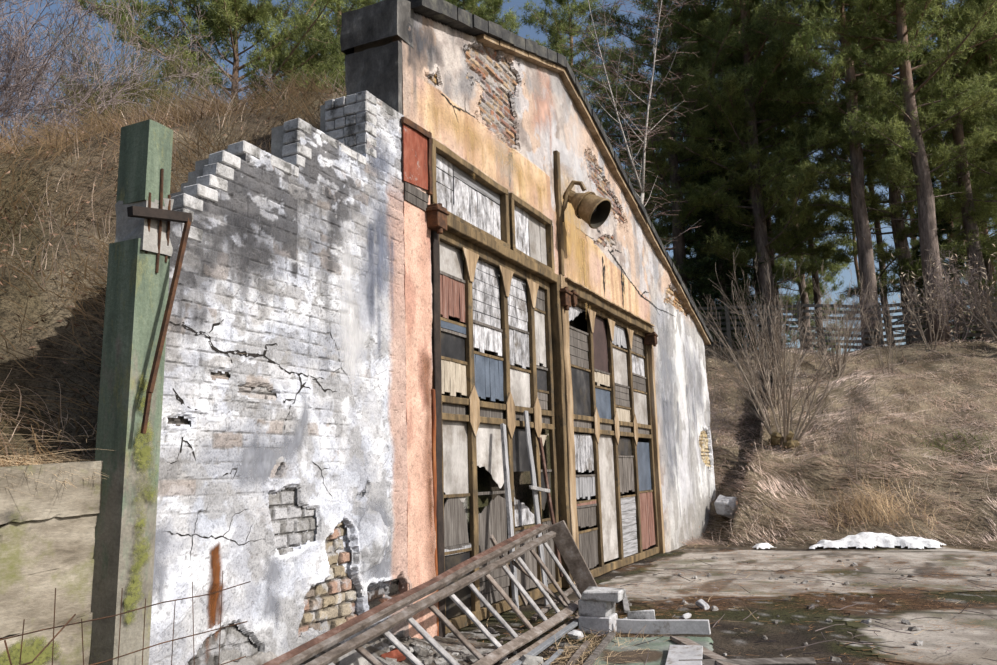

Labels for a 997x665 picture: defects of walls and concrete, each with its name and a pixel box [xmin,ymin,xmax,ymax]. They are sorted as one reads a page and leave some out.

spalling [461,39,525,155]
spalling [583,143,630,252]
crack [169,319,353,421]
spalling [698,424,713,473]
crack [165,506,260,550]
rust [207,544,224,642]
spalling [176,610,271,665]
spalling [262,475,373,648]